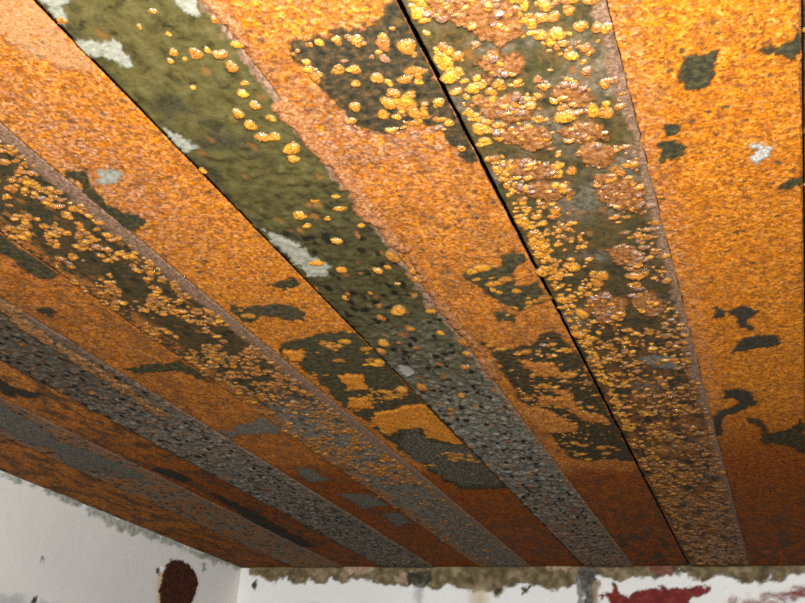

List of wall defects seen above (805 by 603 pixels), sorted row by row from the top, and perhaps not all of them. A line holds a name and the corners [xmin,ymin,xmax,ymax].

corrosion [232,80,301,163]
corrosion [0,140,580,603]
corrosion [290,0,805,583]